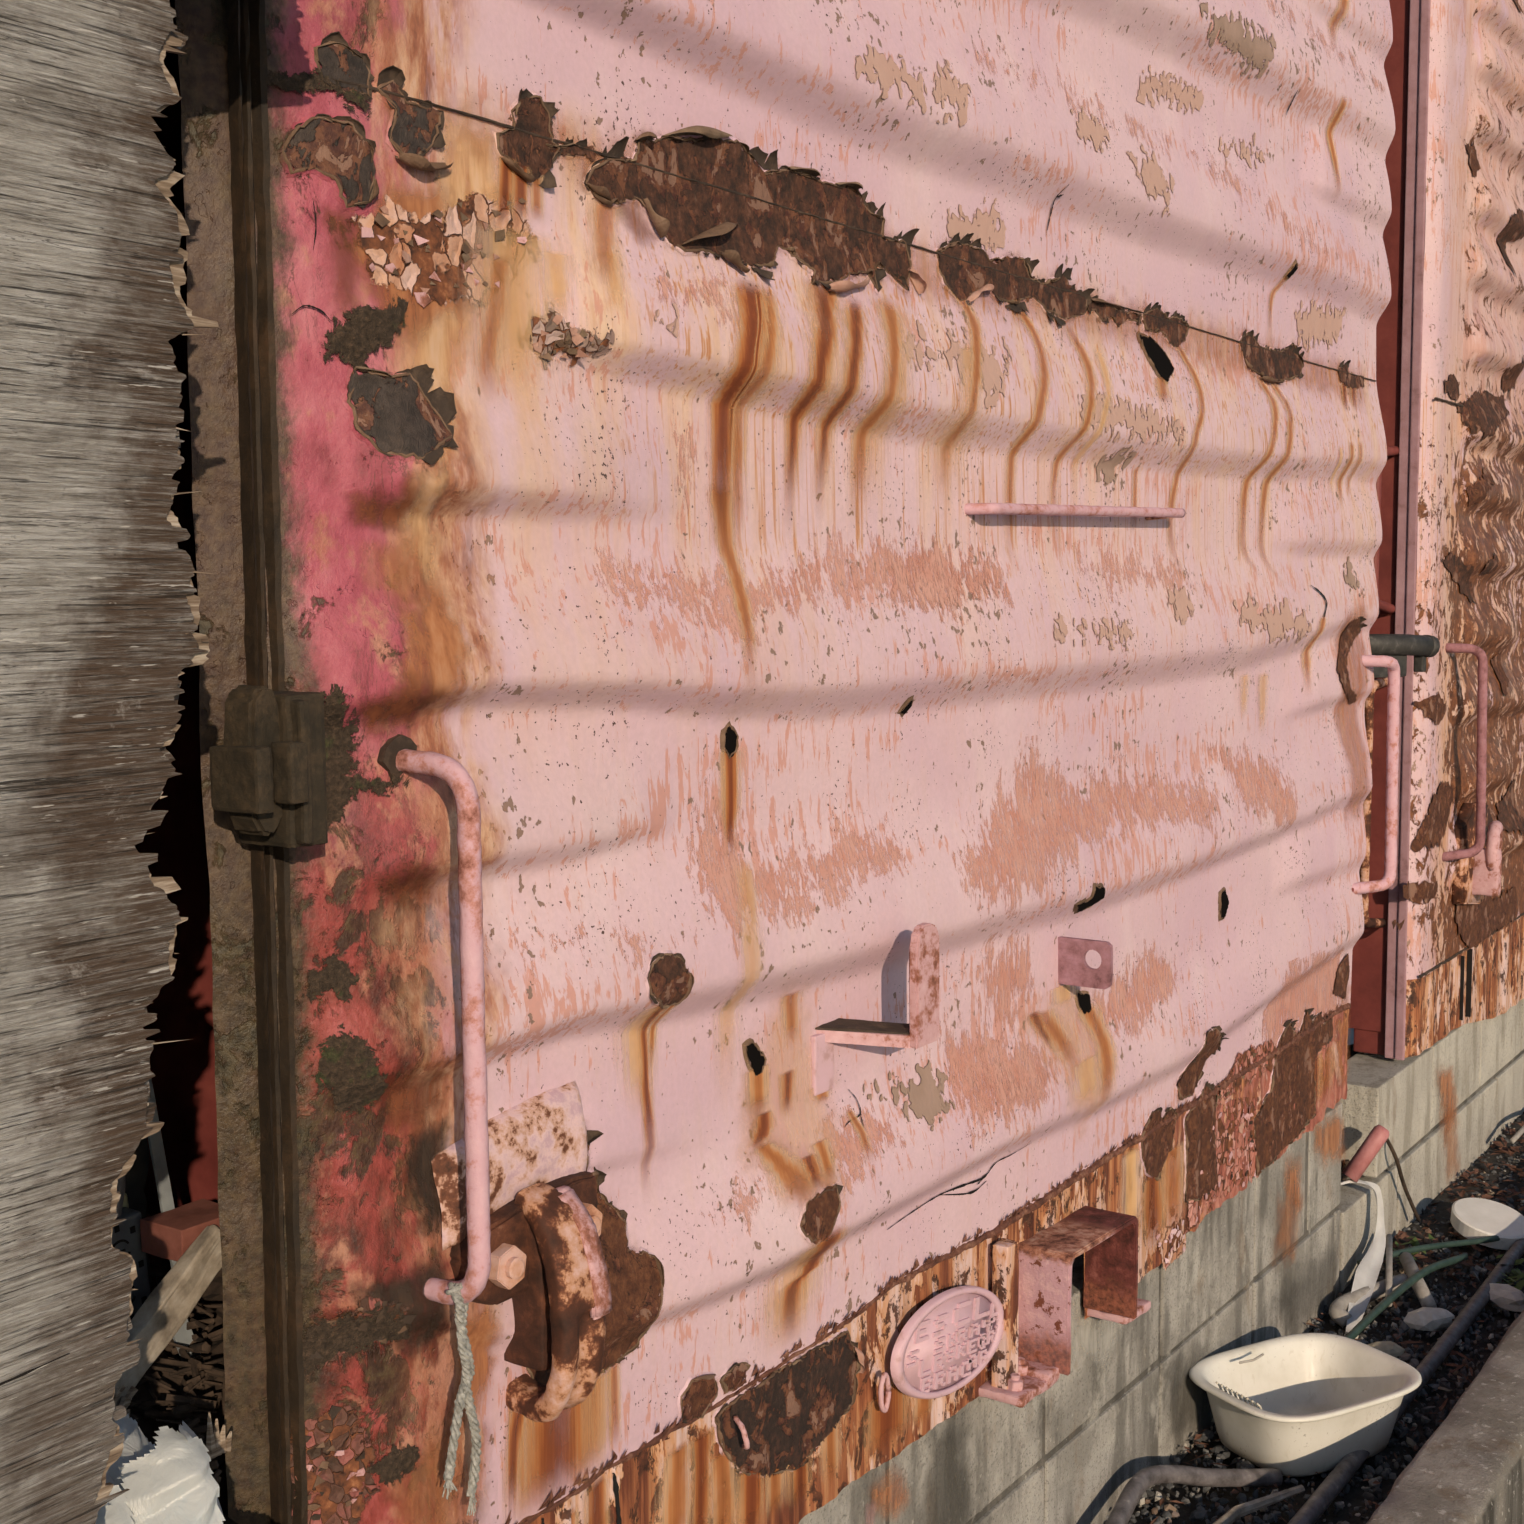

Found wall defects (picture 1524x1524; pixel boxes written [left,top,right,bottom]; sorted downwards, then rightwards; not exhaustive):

spalling [1198,0,1385,89]
peeling [277,31,1189,383]
spalling [974,38,1349,281]
peeling [342,364,459,465]
corrosion [711,286,783,643]
corrosion [786,289,864,471]
corrosion [1241,381,1294,530]
peeling [797,735,1298,1245]
corrosion [749,1065,832,1189]
corrosion [365,1261,446,1350]
corrosion [508,1366,620,1492]
peeling [677,1327,865,1480]